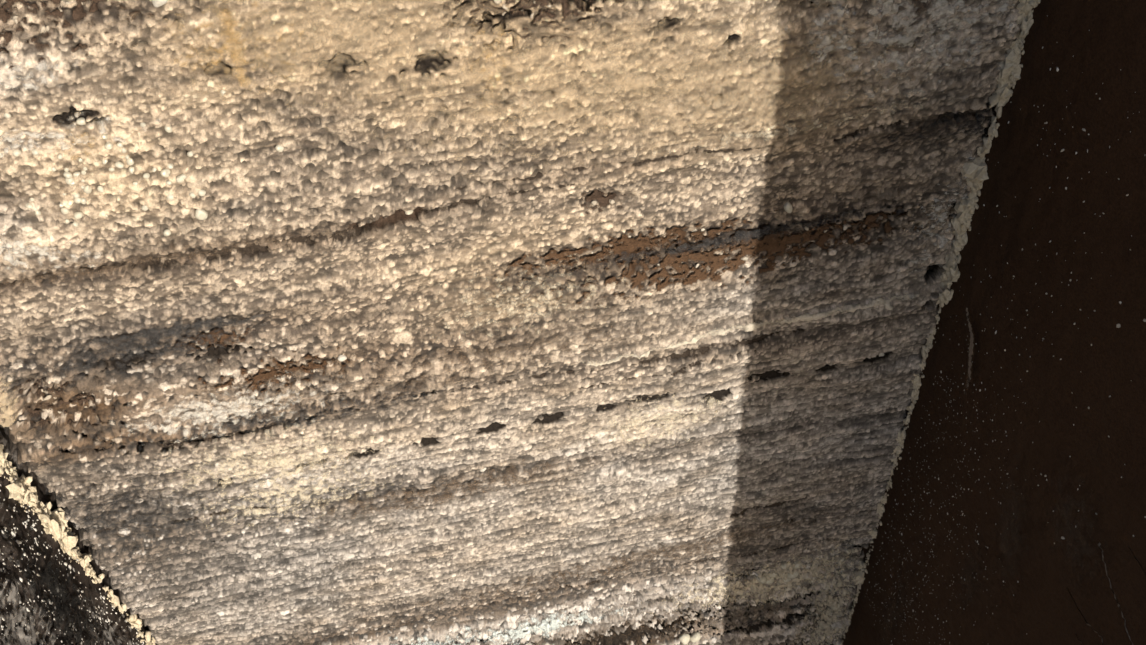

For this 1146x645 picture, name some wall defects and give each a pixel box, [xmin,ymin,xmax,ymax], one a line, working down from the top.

rust [487,201,937,311]
crack [76,422,285,454]
damp [411,608,686,645]
damp [674,541,863,645]